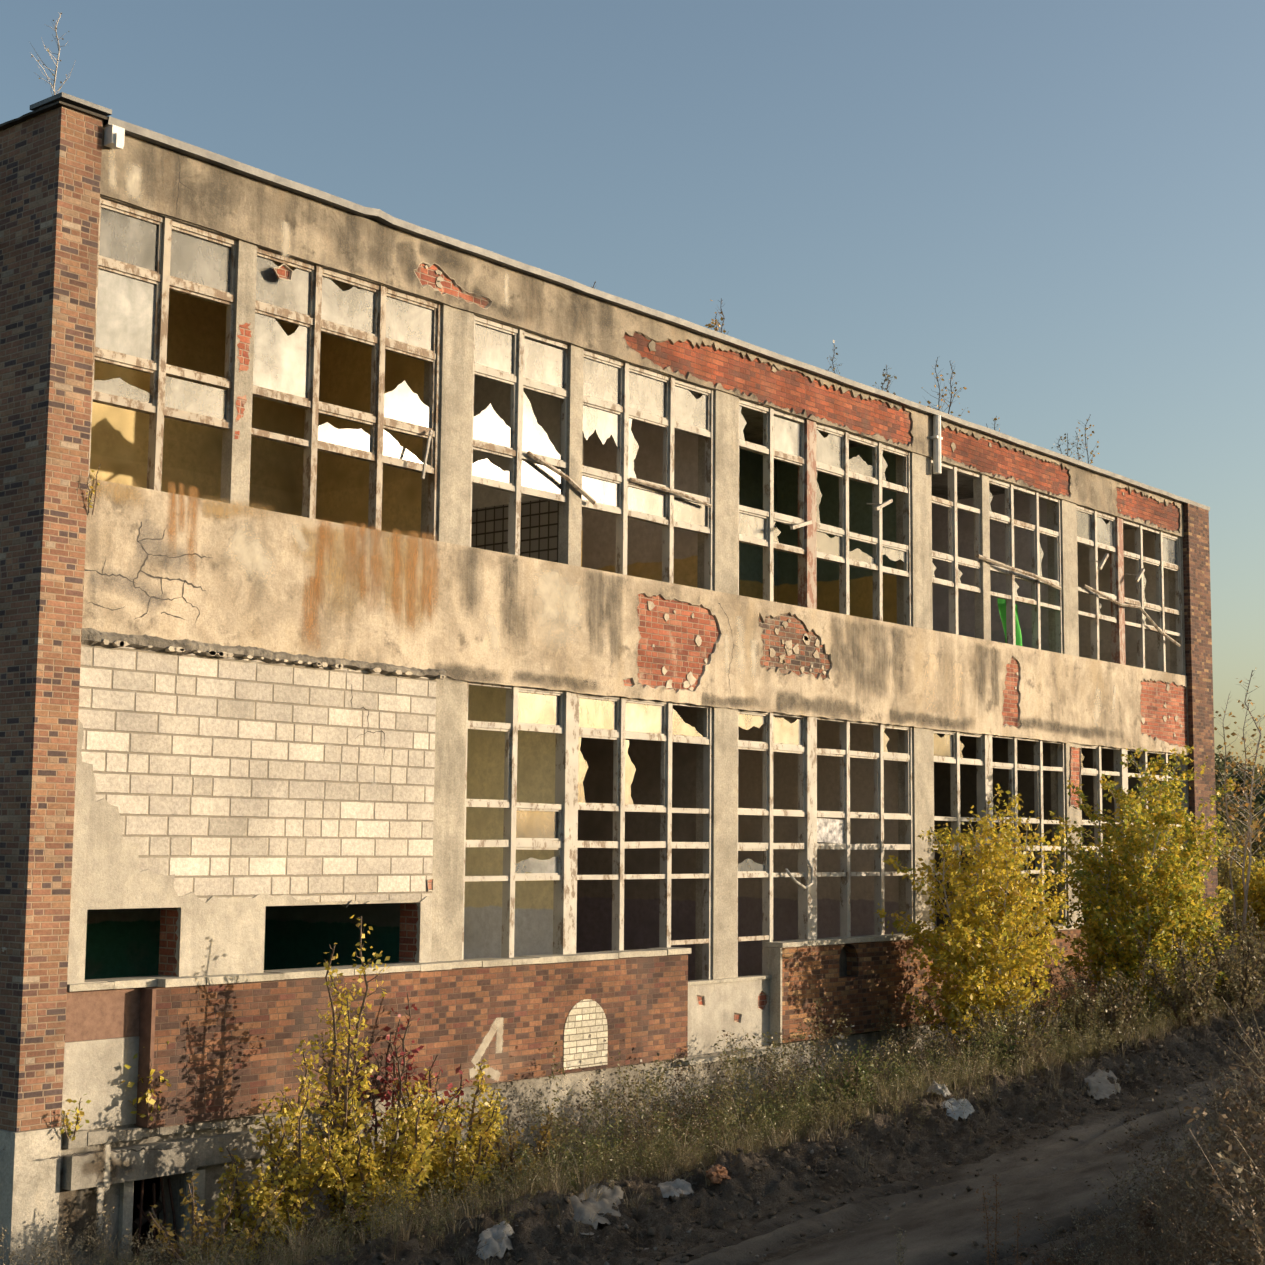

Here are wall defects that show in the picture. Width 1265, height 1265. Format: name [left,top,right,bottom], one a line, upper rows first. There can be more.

spalling [414,262,493,309]
spalling [622,330,914,447]
spalling [941,422,1071,498]
spalling [1116,486,1181,533]
crack [84,522,211,623]
corrosion [305,522,328,640]
corrosion [346,526,437,620]
spalling [81,628,446,679]
spalling [623,592,722,694]
spalling [759,611,833,681]
spalling [1002,655,1022,729]
spalling [1140,678,1188,748]